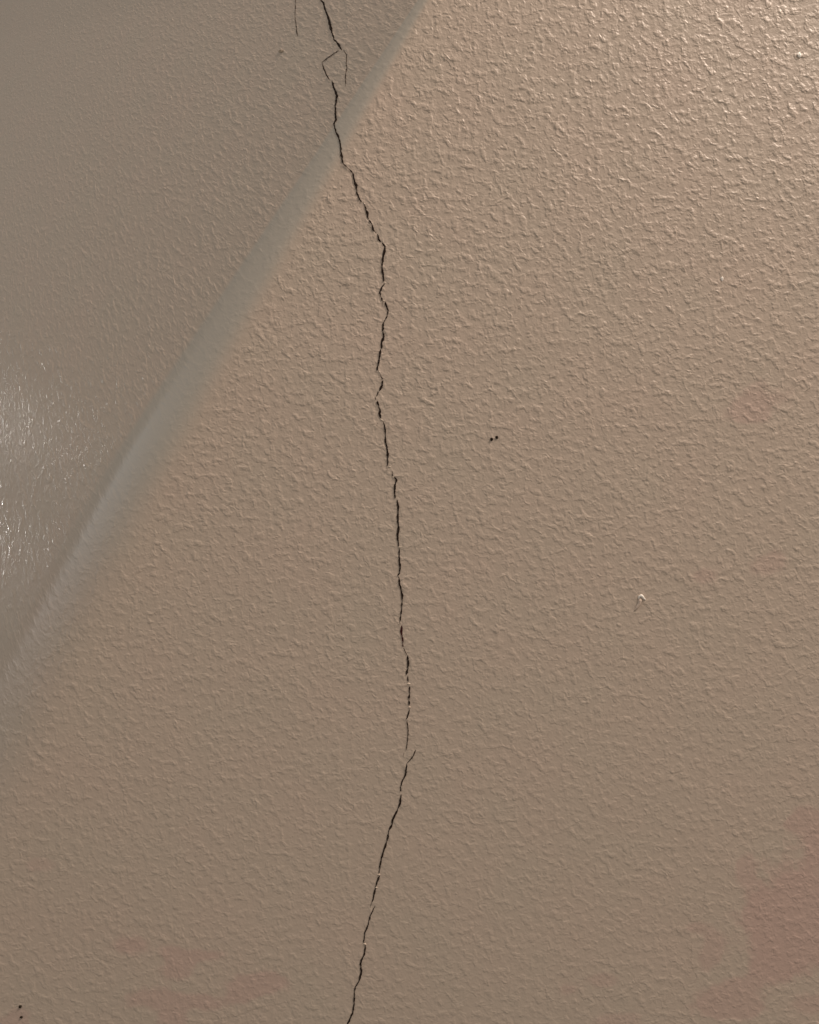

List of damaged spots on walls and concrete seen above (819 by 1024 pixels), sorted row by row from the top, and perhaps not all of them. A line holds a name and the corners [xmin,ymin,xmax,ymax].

crack [295,0,416,1024]